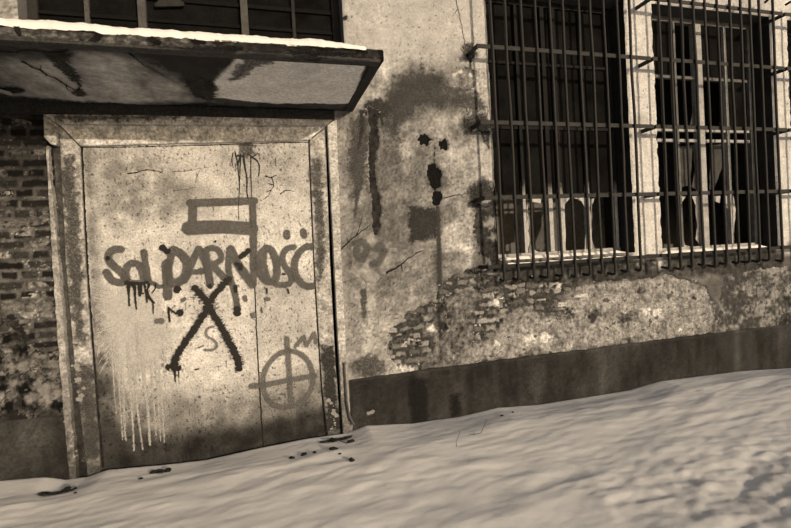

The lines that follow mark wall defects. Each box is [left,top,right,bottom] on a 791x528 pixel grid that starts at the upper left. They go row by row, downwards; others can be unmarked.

crack [0,26,81,93]
leakage [146,41,368,107]
leakage [347,63,486,217]
flaking render [0,114,78,458]
flaking render [386,191,791,372]
peeling [71,340,86,402]